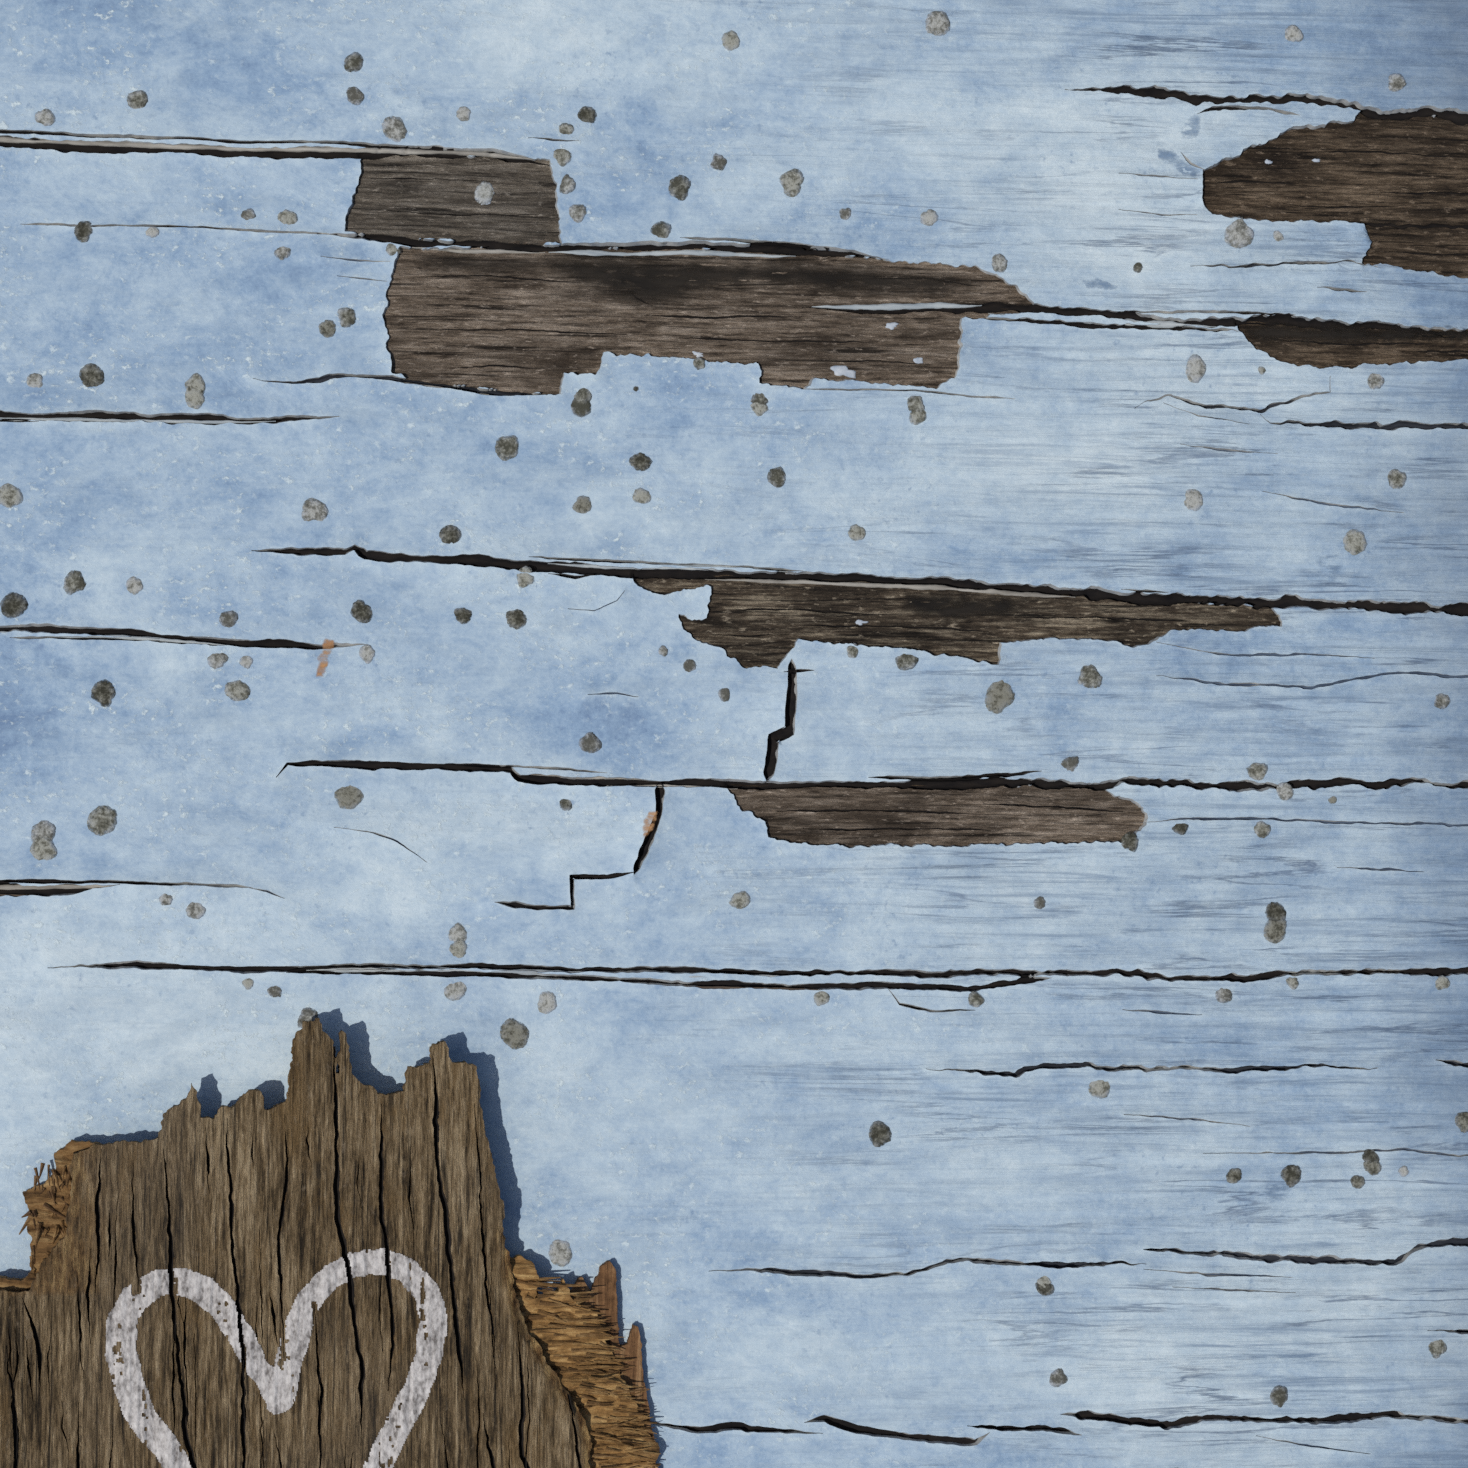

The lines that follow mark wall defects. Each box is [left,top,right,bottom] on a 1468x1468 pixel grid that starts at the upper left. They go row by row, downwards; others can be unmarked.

crack [0,131,559,166]
peeling [1202,113,1468,279]
peeling [346,155,1032,395]
peeling [1237,324,1468,369]
crack [256,546,1468,616]
crack [0,626,337,650]
peeling [633,578,1281,669]
crack [277,662,1468,910]
peeling [728,785,1145,848]
crack [94,962,1468,1015]
crack [761,1238,1468,1291]
crack [657,1410,1468,1454]